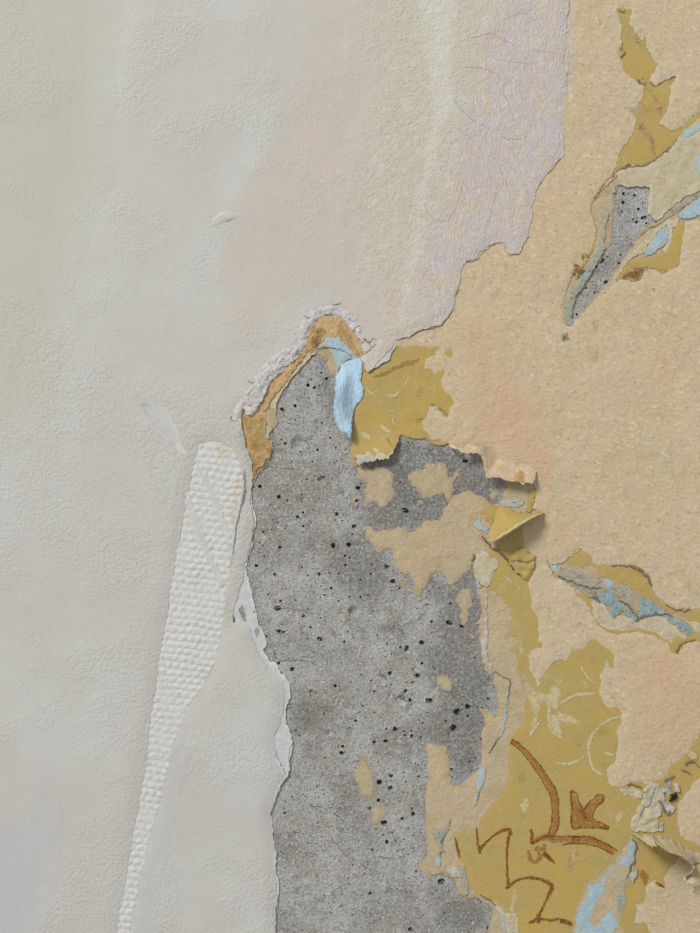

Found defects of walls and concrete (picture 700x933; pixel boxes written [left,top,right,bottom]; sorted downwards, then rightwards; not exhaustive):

peeling [564,118,700,326]
peeling [230,0,599,933]
peeling [548,549,700,652]
peeling [572,751,698,933]